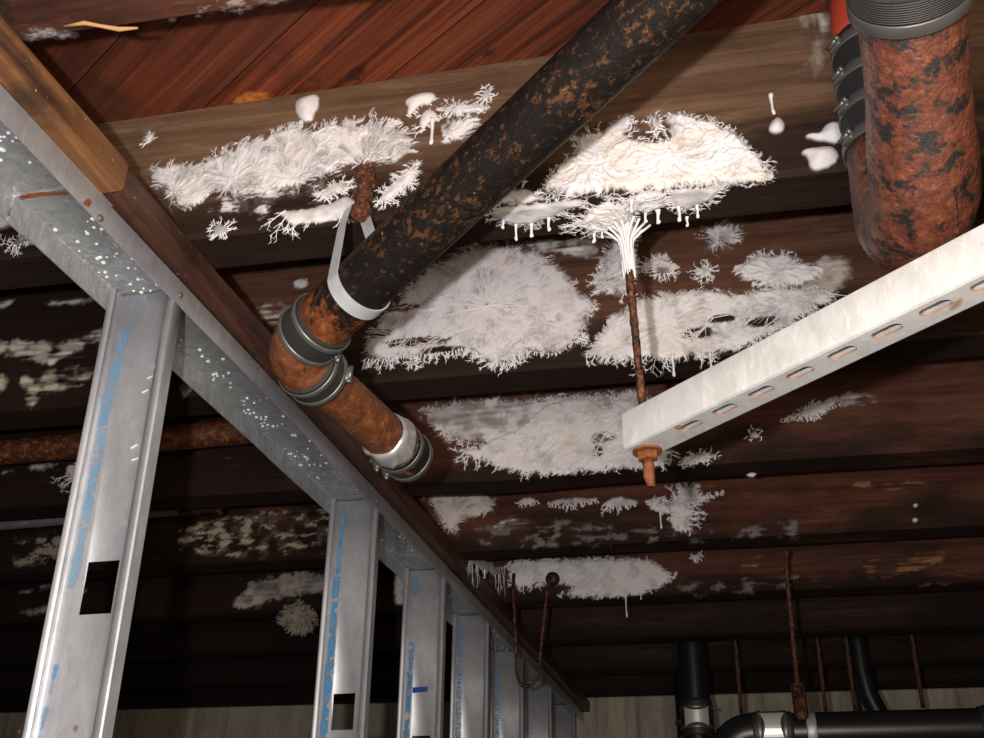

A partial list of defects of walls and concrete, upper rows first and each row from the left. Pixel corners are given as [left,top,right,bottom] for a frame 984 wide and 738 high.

damp [801,256,850,292]
damp [0,330,102,406]
damp [423,494,658,548]
damp [738,525,766,537]
damp [779,520,798,536]
damp [234,572,324,609]